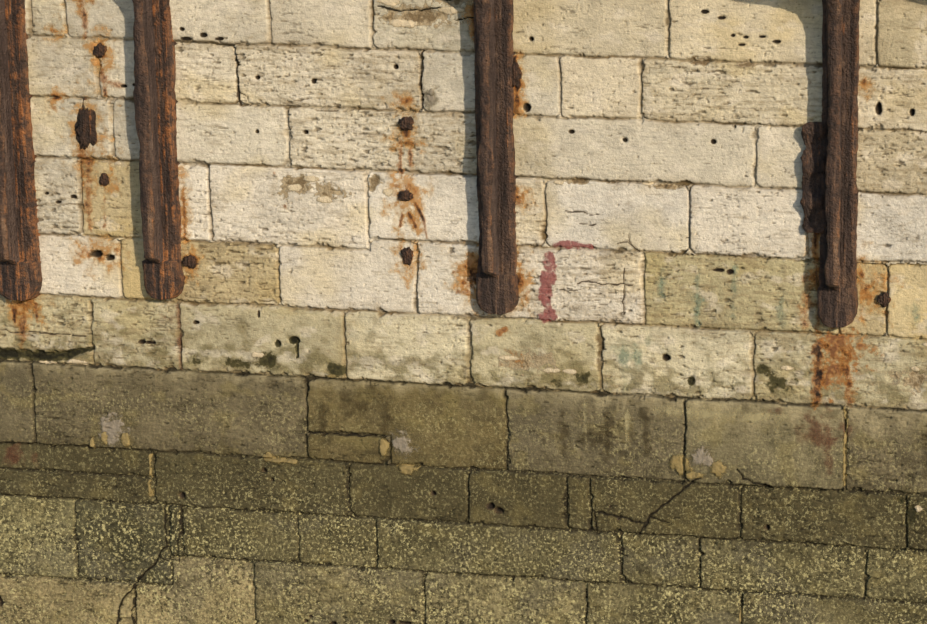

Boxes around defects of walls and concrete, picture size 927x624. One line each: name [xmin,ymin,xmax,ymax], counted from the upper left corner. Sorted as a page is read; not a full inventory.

corrosion [72,0,120,97]
corrosion [50,89,68,109]
corrosion [68,104,122,271]
corrosion [383,126,427,288]
corrosion [6,299,44,342]
corrosion [453,244,479,315]
corrosion [516,251,533,307]
corrosion [802,233,889,407]
crack [594,478,700,535]
crack [116,504,184,624]